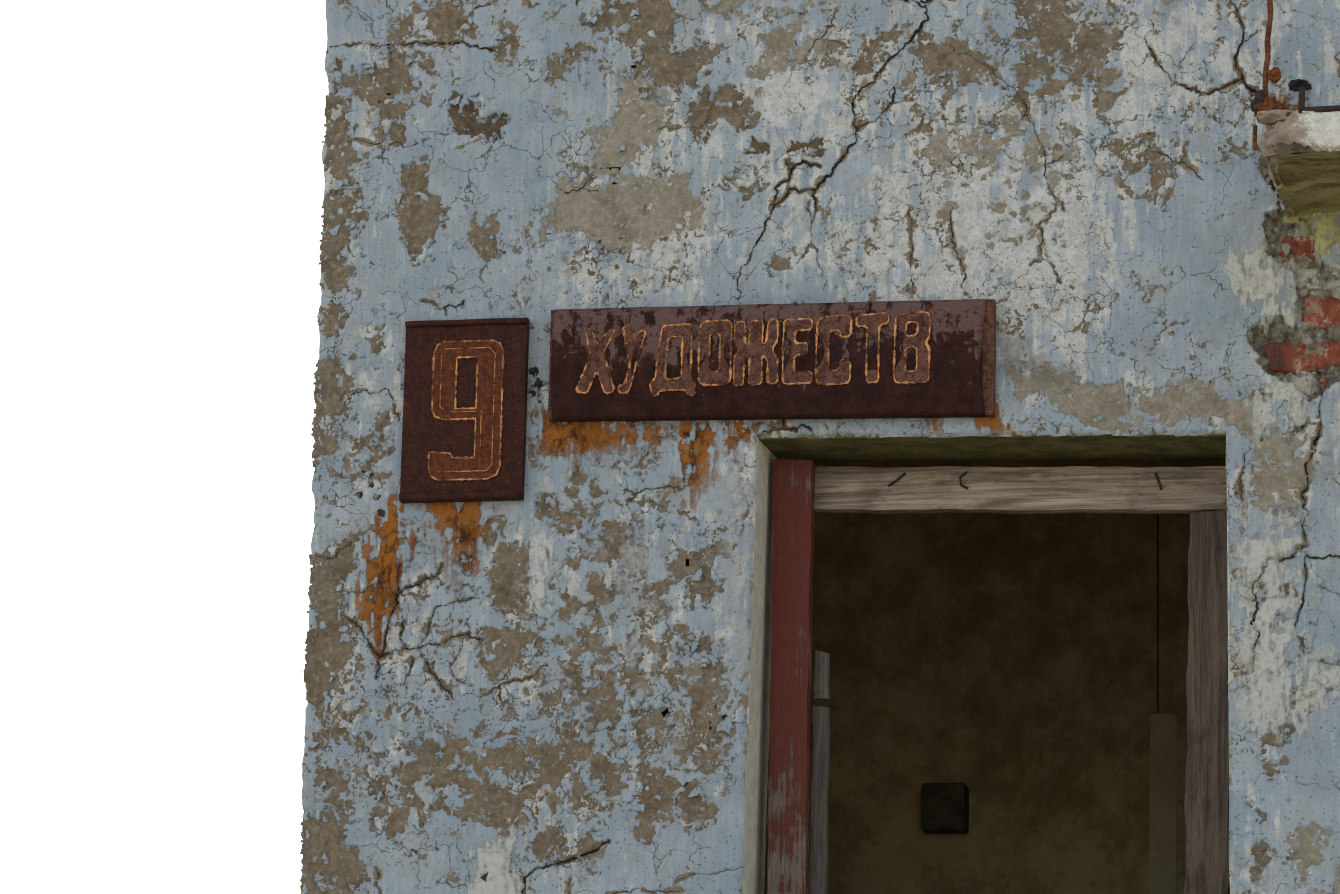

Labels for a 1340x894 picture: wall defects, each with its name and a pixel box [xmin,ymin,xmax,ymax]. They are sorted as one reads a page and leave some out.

peeling [538,0,829,256]
crack [737,0,1064,300]
crack [1144,1,1258,101]
rust [355,494,416,650]
rust [426,502,494,574]
rust [534,409,660,453]
rust [678,420,760,506]
spalling [1003,213,1340,522]
crack [1235,386,1340,674]
peeling [300,466,738,894]
crack [521,841,609,894]
peeling [1245,797,1340,894]